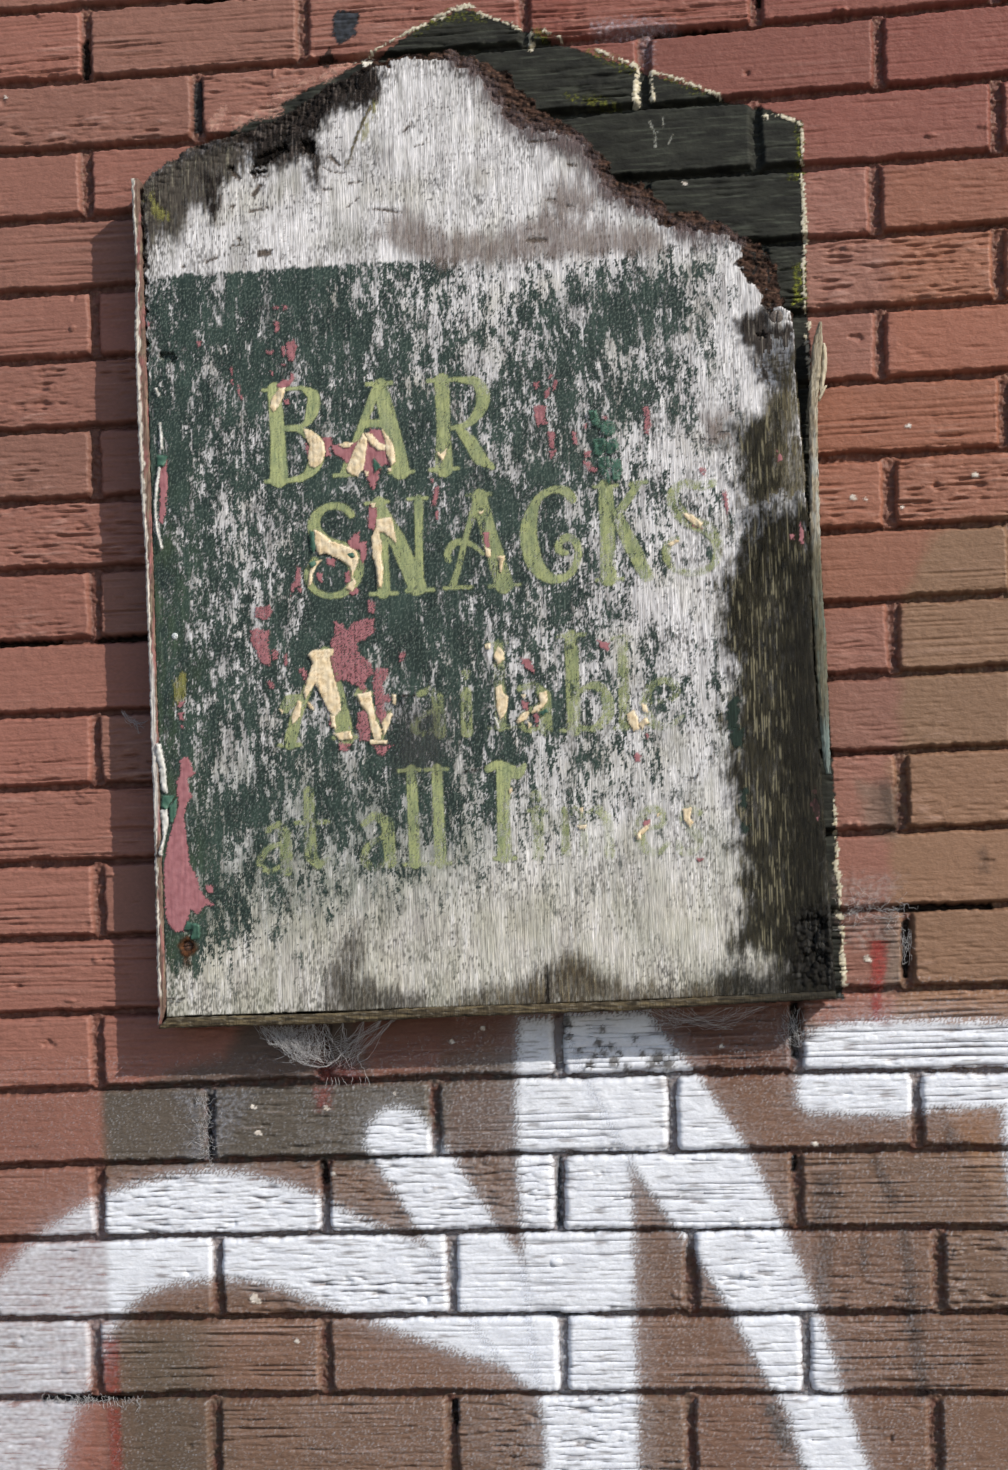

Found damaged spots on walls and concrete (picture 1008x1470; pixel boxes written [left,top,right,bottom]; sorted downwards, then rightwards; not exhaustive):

peeling [194,81,203,135]
peeling [230,3,848,1002]